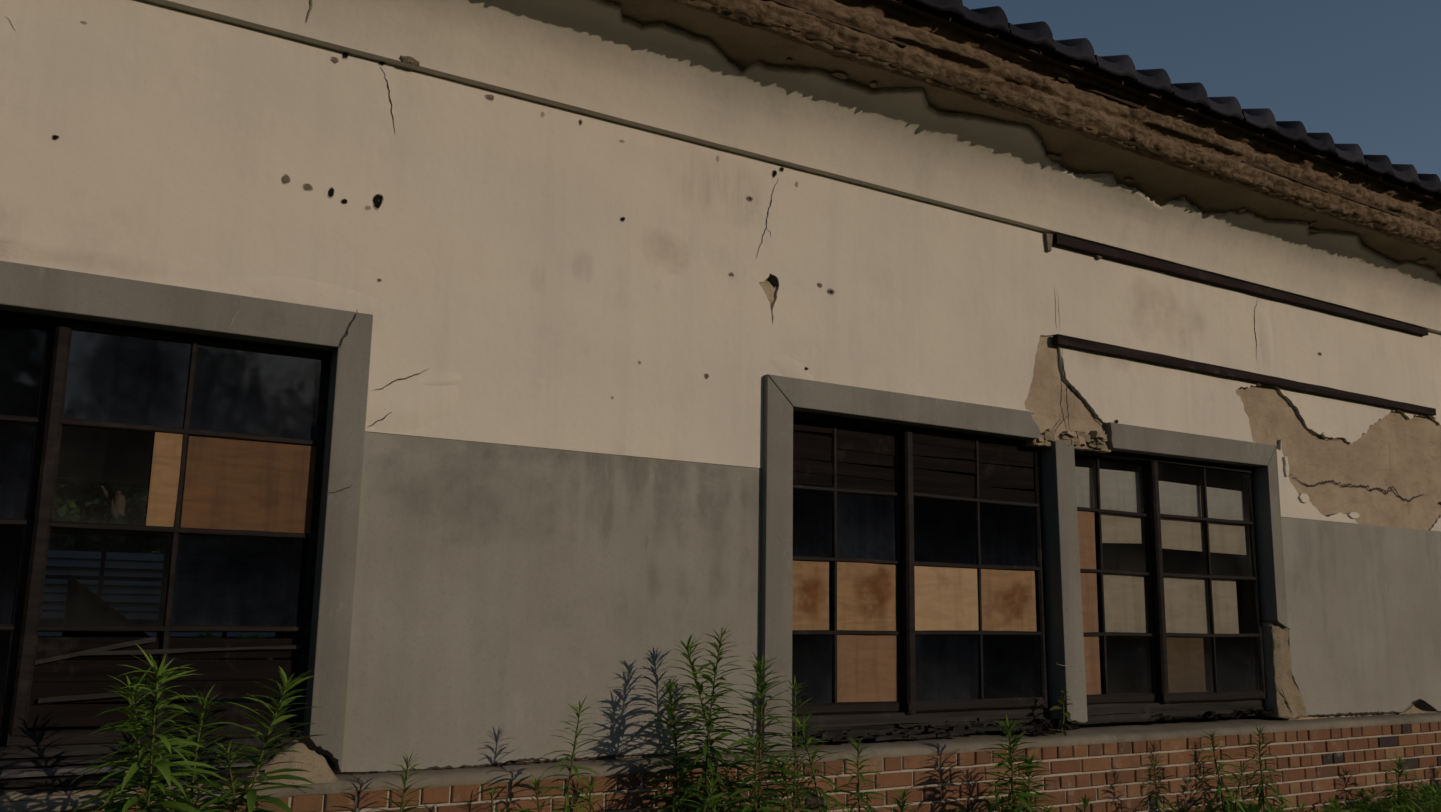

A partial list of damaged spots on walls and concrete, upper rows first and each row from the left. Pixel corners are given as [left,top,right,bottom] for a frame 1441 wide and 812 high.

peeling [378,56,420,67]
crack [379,66,395,130]
flaking render [605,0,1441,276]
crack [756,182,778,257]
spalling [759,275,778,324]
crack [368,368,429,427]
spalling [1023,335,1118,453]
spalling [1236,384,1441,530]
spalling [1399,699,1438,715]
spalling [0,739,340,802]